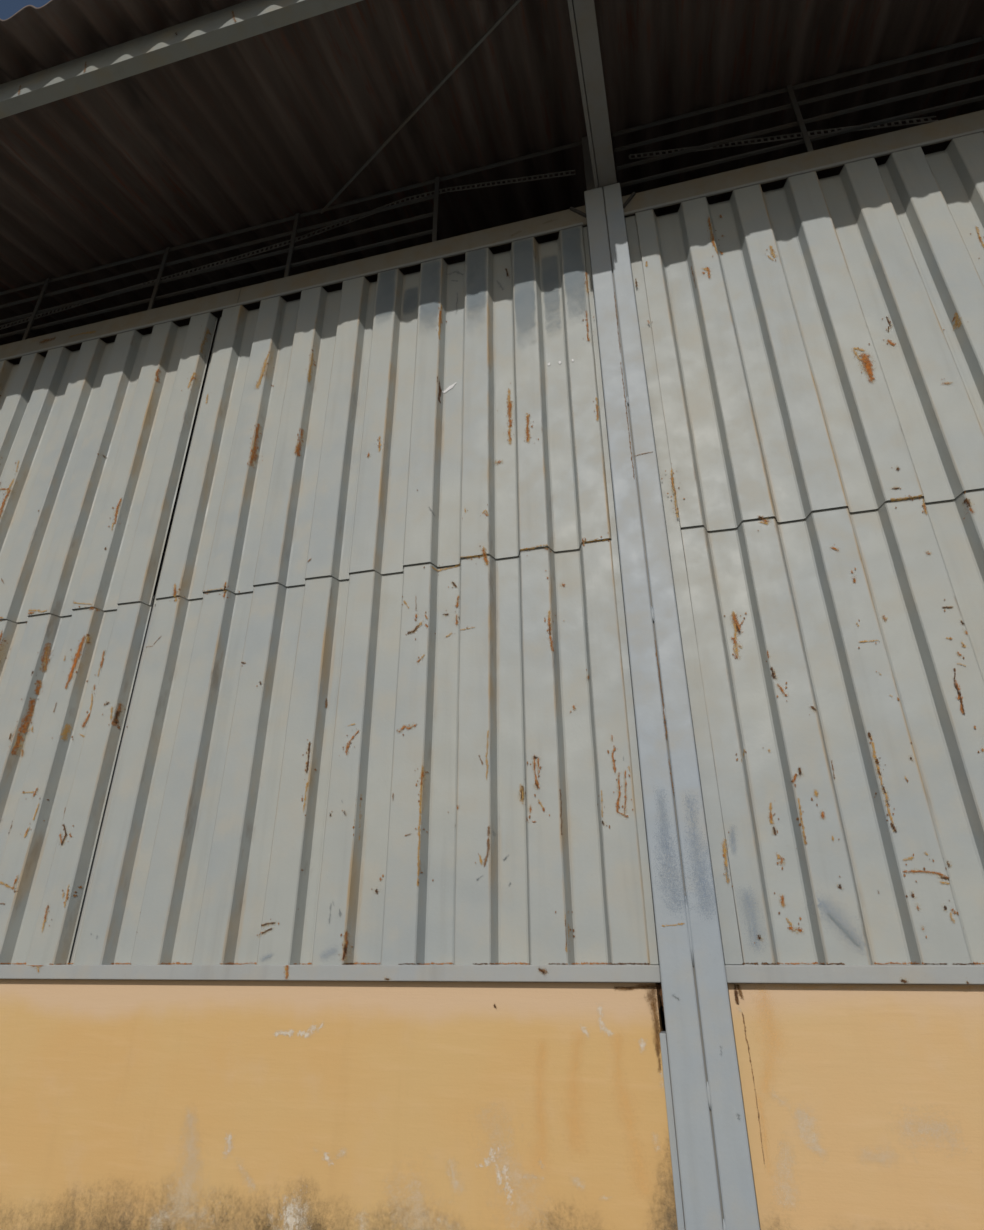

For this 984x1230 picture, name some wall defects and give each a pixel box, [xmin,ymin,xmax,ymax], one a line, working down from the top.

rust [853,316,896,382]
rust [247,424,264,469]
rust [724,612,747,659]
rust [7,634,127,757]
rust [519,755,562,835]
rust [597,740,633,829]
rust [866,731,897,832]
rust [903,852,951,910]
rust [874,962,984,983]
damp [267,1185,311,1230]